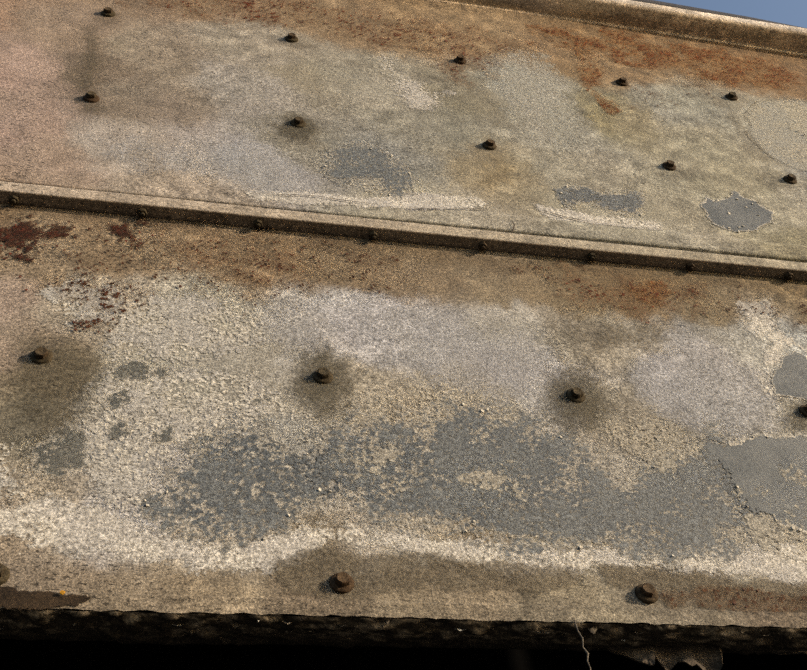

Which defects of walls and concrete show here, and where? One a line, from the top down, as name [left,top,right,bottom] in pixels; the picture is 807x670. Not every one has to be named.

rust [142,0,800,115]
peeling [554,185,645,215]
peeling [701,191,774,232]
rust [0,214,339,333]
rust [341,250,408,298]
peeling [107,390,130,410]
peeling [116,361,170,380]
peeling [771,351,807,401]
peeling [110,421,130,439]
leakage [0,278,807,601]
peeling [140,391,807,572]
leakage [0,586,91,610]